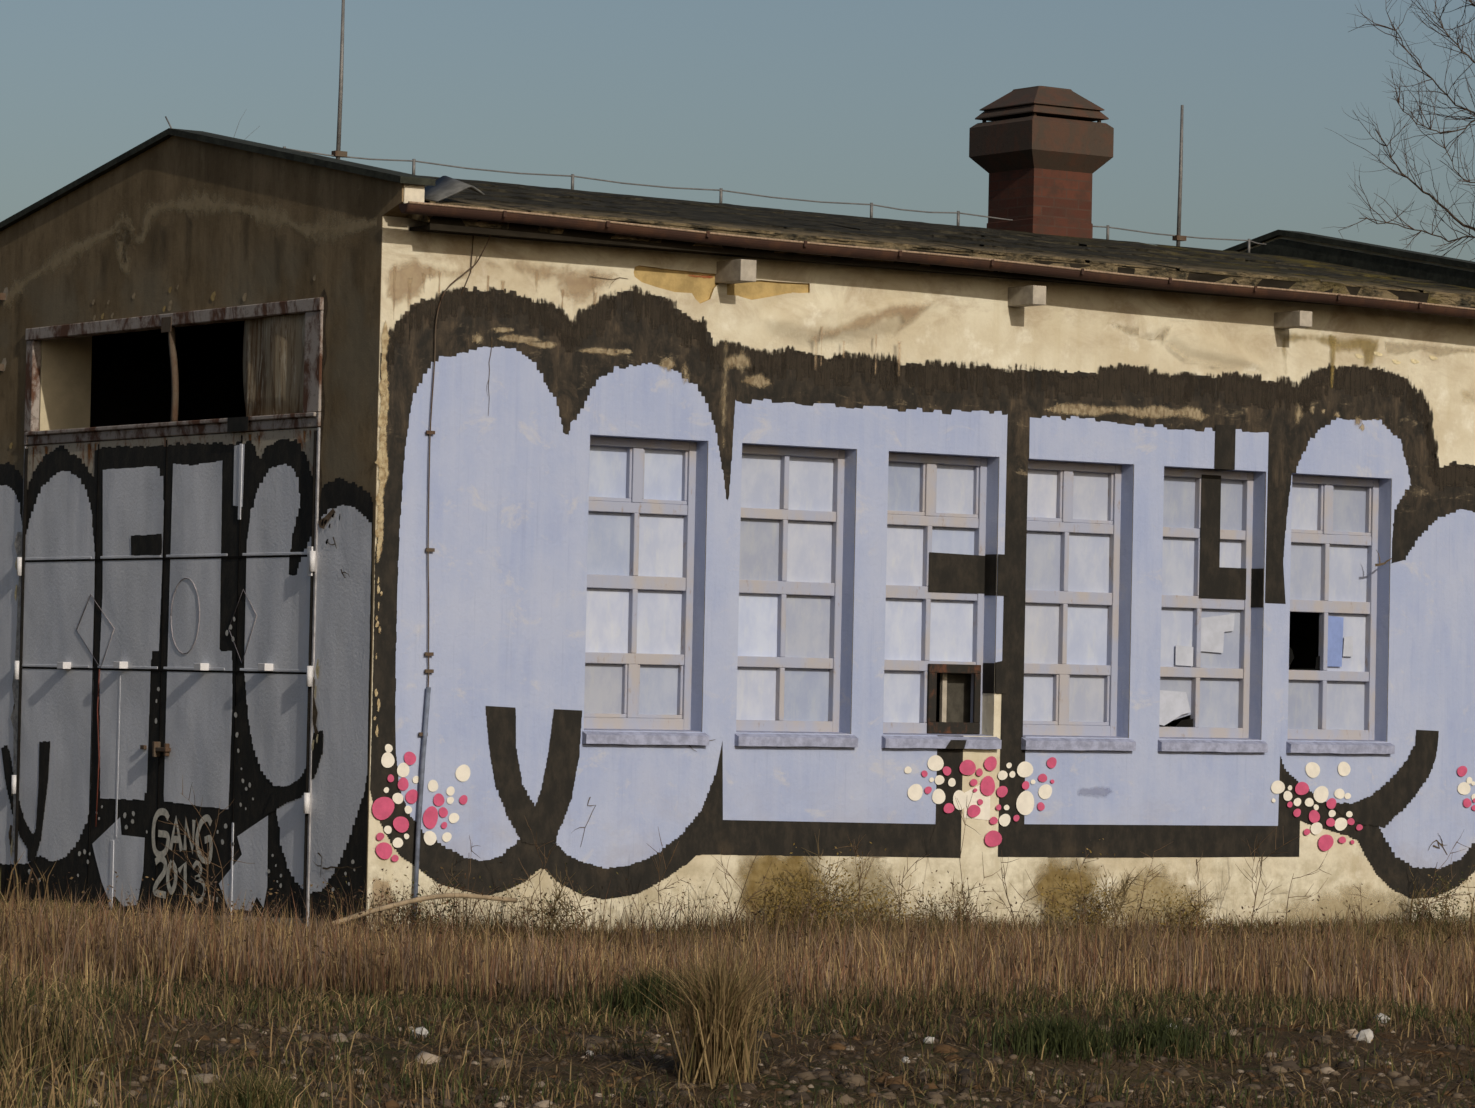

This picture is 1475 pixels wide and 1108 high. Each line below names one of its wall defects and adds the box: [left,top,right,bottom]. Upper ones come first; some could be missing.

leakage [3,192,377,307]
leakage [389,262,440,301]
leakage [518,265,607,309]
spalling [634,265,810,304]